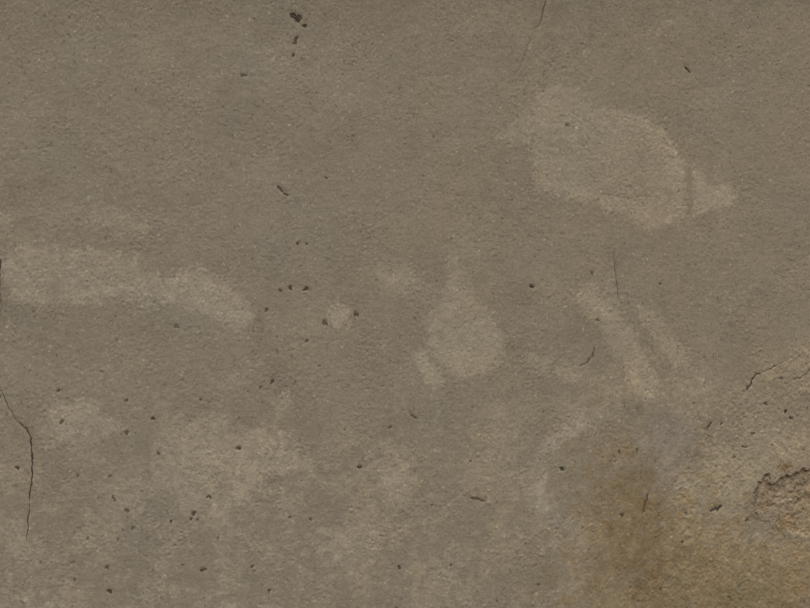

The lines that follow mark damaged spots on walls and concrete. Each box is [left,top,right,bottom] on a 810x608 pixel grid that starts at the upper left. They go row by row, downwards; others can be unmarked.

crack [0,389,34,540]
peeling [561,271,810,544]